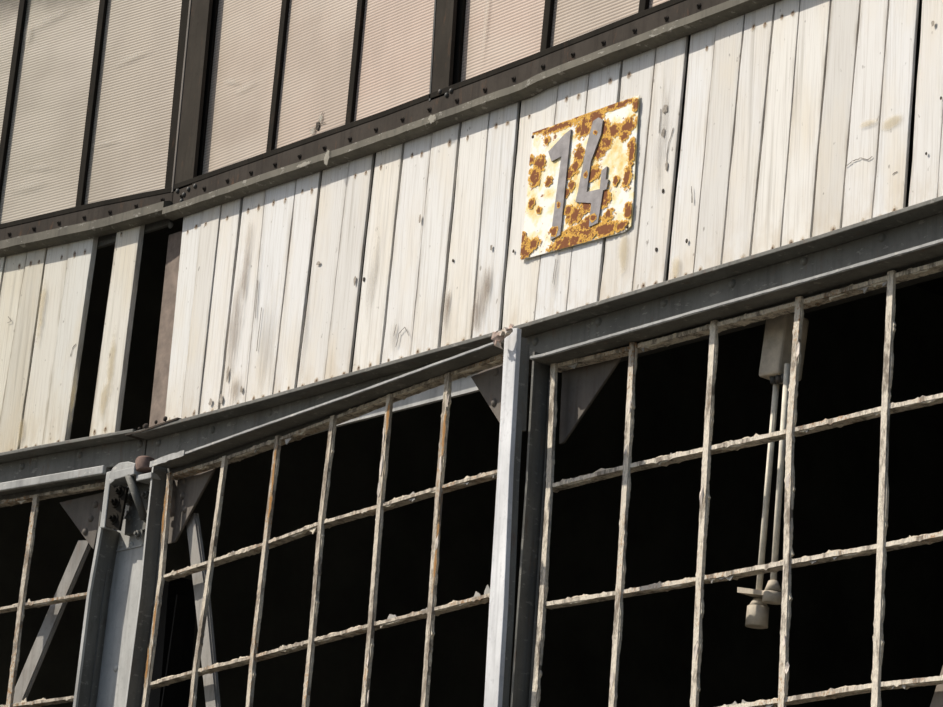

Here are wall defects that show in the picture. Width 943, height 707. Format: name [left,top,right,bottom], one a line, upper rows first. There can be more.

corrosion [520,98,638,259]
peeling [377,427,385,498]